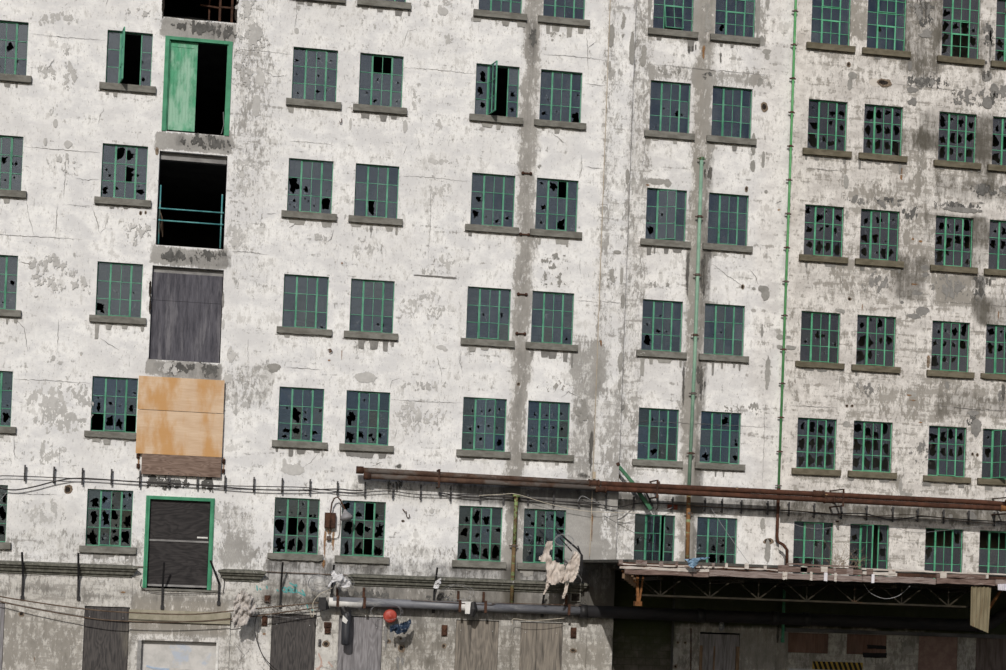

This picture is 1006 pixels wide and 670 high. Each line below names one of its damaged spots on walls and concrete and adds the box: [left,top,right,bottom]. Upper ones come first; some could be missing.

leakage [908,75,949,89]
peeling [805,155,902,219]
leakage [934,183,1006,208]
peeling [28,253,90,298]
peeling [0,380,111,467]